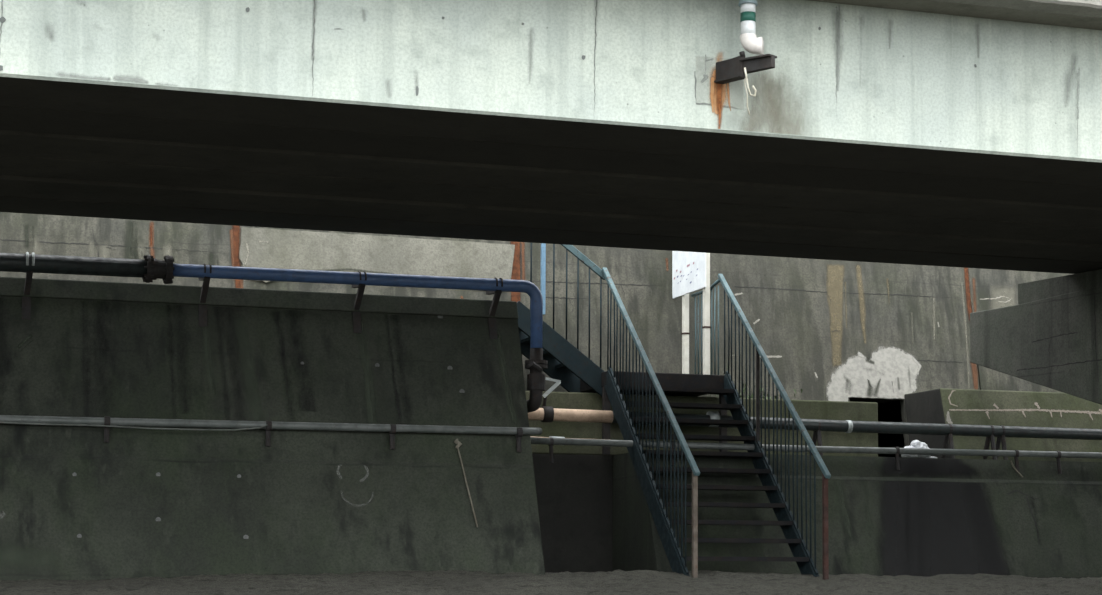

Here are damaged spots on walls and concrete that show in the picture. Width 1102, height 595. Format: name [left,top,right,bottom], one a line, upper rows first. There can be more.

corrosion [710,55,731,129]
corrosion [230,225,243,288]